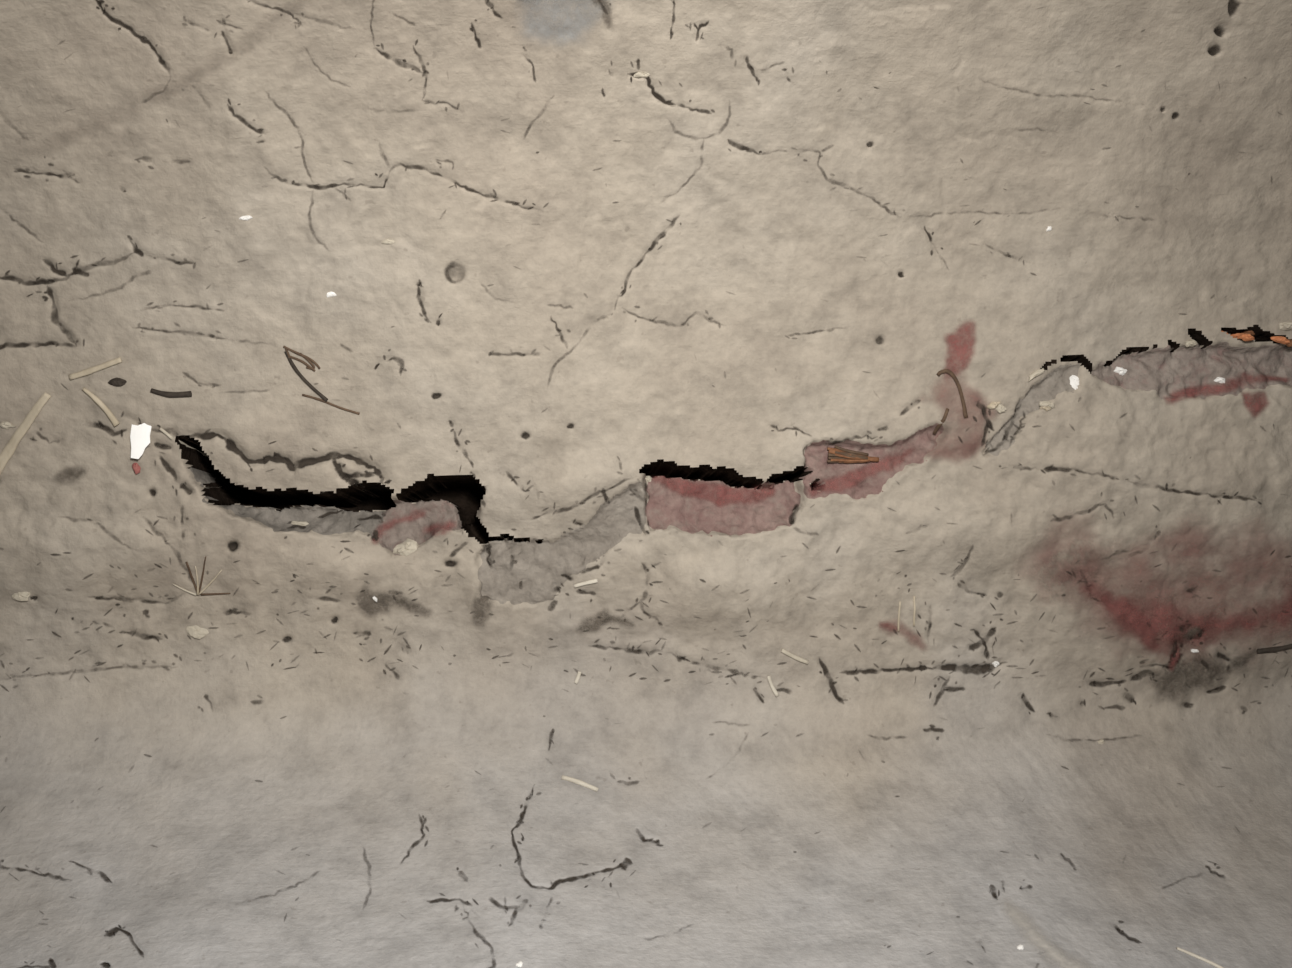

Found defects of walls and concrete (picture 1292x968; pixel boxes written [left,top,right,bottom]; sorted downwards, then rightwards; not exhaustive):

crack [96,0,167,67]
crack [602,59,714,113]
crack [277,162,547,213]
crack [0,255,104,349]
spalling [986,321,1292,456]
crack [1040,325,1289,374]
spalling [189,467,462,557]
crack [95,409,906,669]
spalling [478,423,944,605]
crack [973,404,1113,521]
crack [819,581,1002,739]
crack [429,791,663,968]